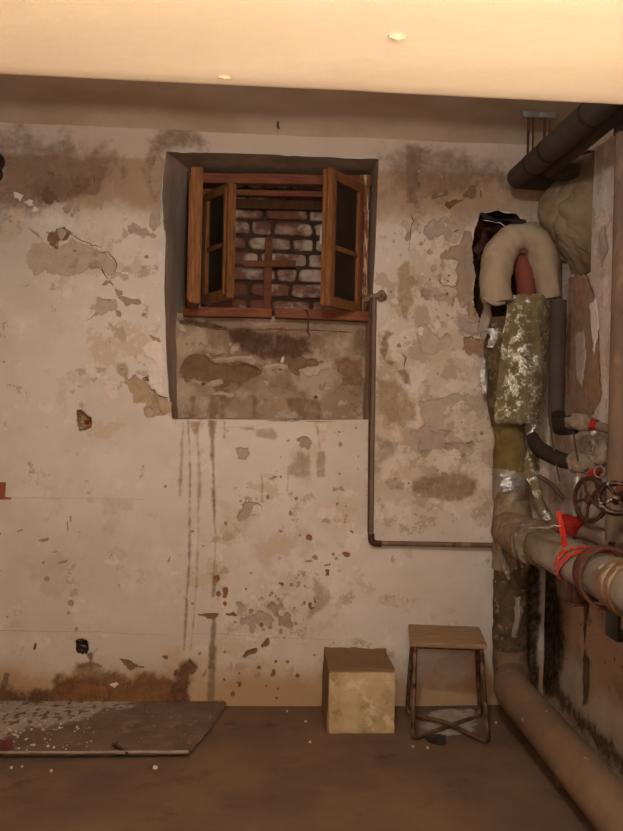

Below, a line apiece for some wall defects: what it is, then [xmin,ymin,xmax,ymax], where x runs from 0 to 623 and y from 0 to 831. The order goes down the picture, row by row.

peeling [26,227,145,317]
crack [73,235,117,279]
spalling [414,185,527,357]
peeling [119,335,172,418]
spalling [179,350,335,397]
peeling [565,274,602,415]
spalling [77,410,92,431]
leakage [182,395,225,458]
corrosion [45,659,187,702]
leakage [172,618,216,701]
peeling [198,591,316,658]
leakage [526,565,623,774]